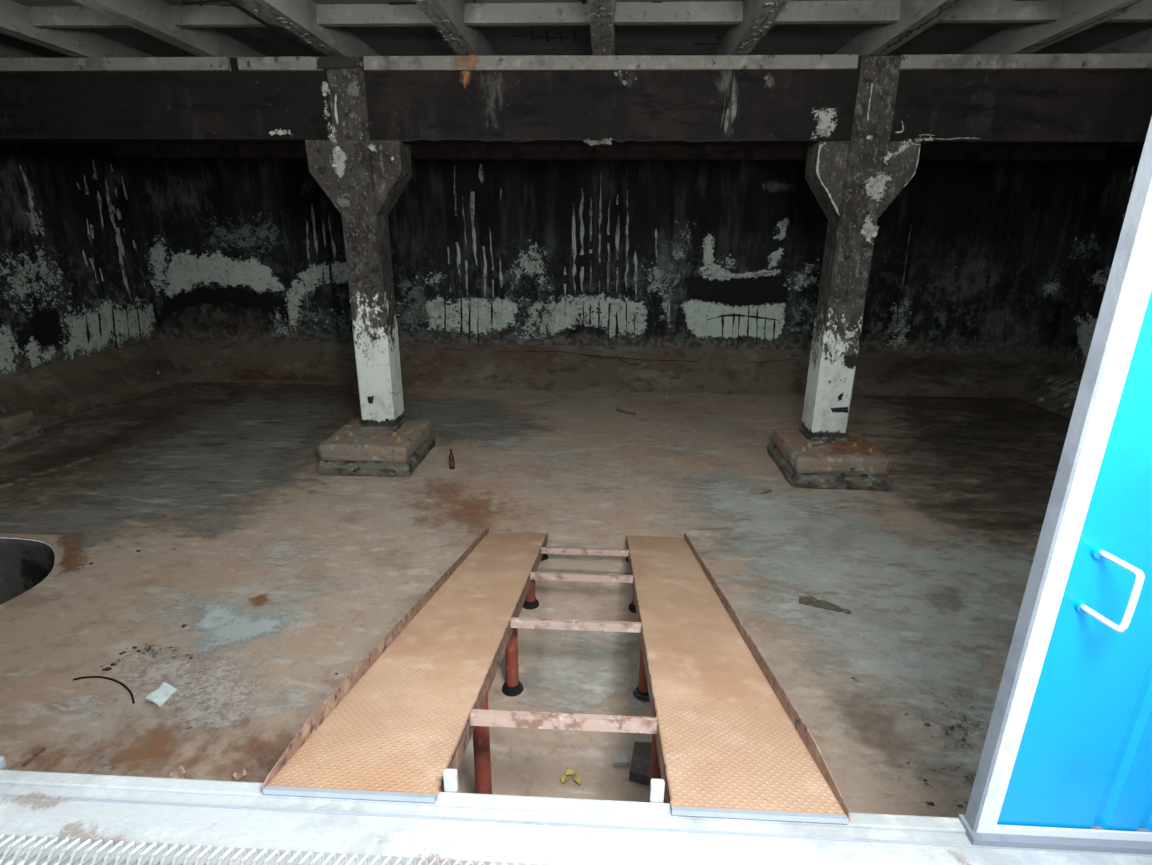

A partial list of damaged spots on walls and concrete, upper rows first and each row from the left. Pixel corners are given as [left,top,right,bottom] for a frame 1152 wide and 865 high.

rust [456,54,477,86]
water stain [29,303,70,351]
water stain [77,159,137,301]
water stain [160,286,289,335]
peeling [0,195,648,422]
water stain [447,164,503,297]
water stain [563,172,790,331]
peeling [679,218,863,447]
spalling [854,137,933,279]
peeling [885,224,912,349]
rust [59,534,87,573]
water stain [679,365,1081,804]